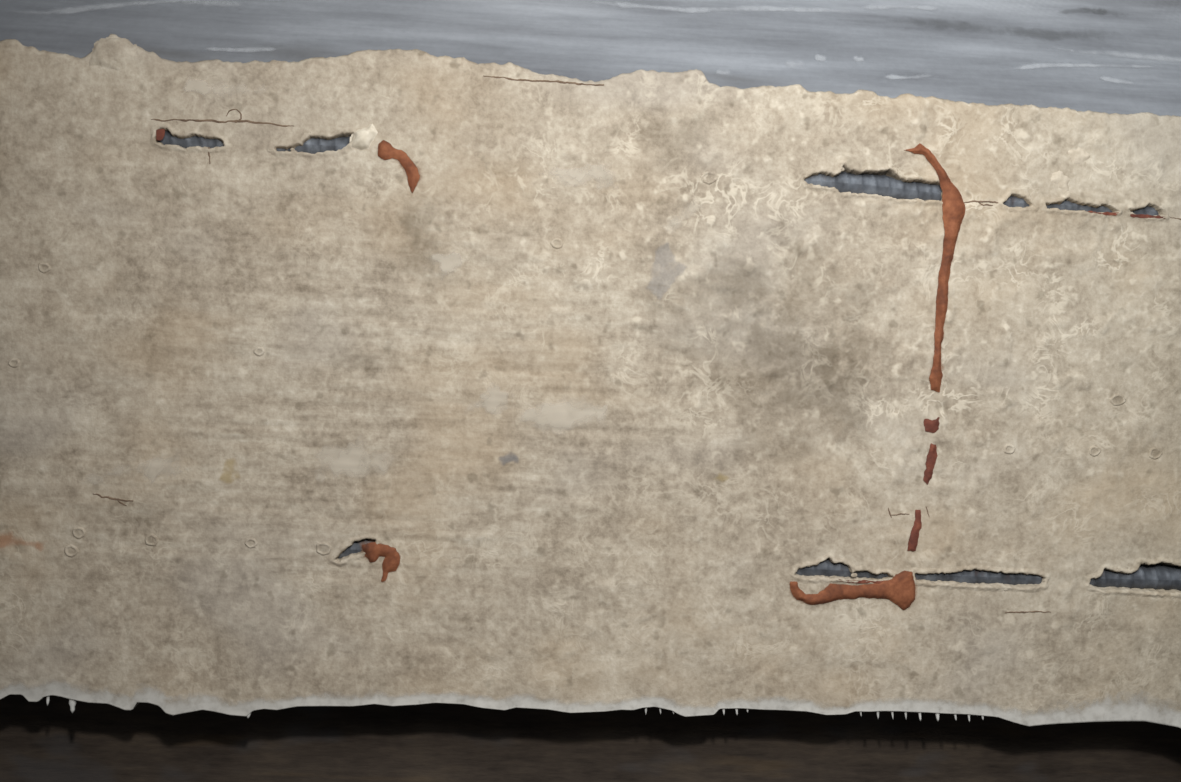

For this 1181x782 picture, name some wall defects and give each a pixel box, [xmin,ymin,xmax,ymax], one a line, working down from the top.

spalling [149,121,232,155]
spalling [265,127,358,160]
rust [378,140,420,193]
spalling [798,158,943,207]
spalling [997,187,1171,223]
rust [906,143,965,392]
rust [923,417,940,485]
rust [908,510,922,551]
rust [362,542,400,582]
rust [790,571,915,610]
spalling [789,552,1051,593]
spalling [1084,556,1181,600]